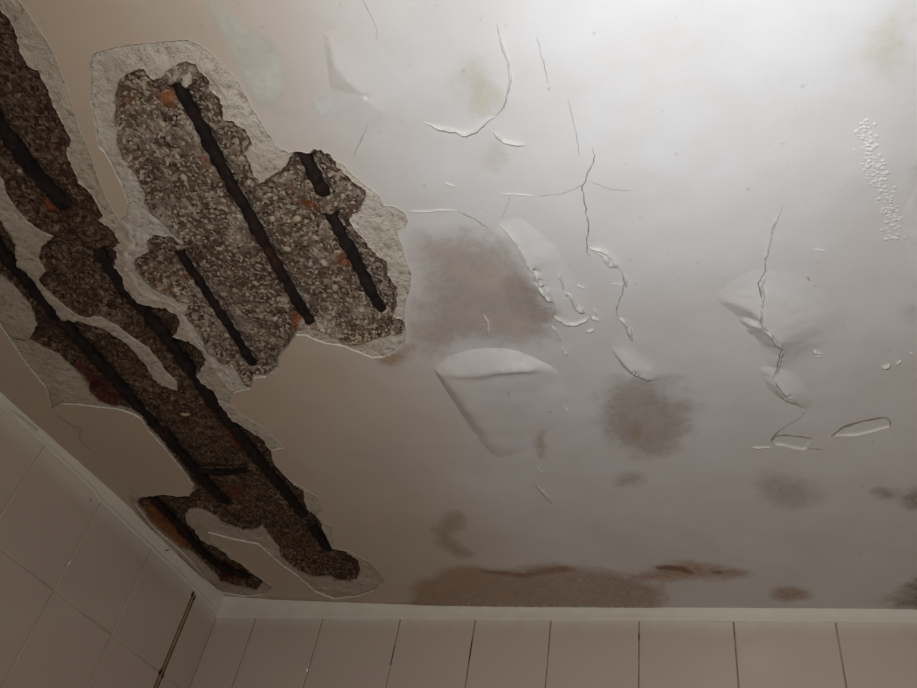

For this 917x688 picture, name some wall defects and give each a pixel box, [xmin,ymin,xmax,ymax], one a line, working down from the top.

crack [424,27,512,137]
crack [408,102,633,355]
spalling [0,0,411,599]
damp [428,246,540,340]
crack [752,207,891,450]
peeling [828,417,892,438]
rust [147,502,187,549]